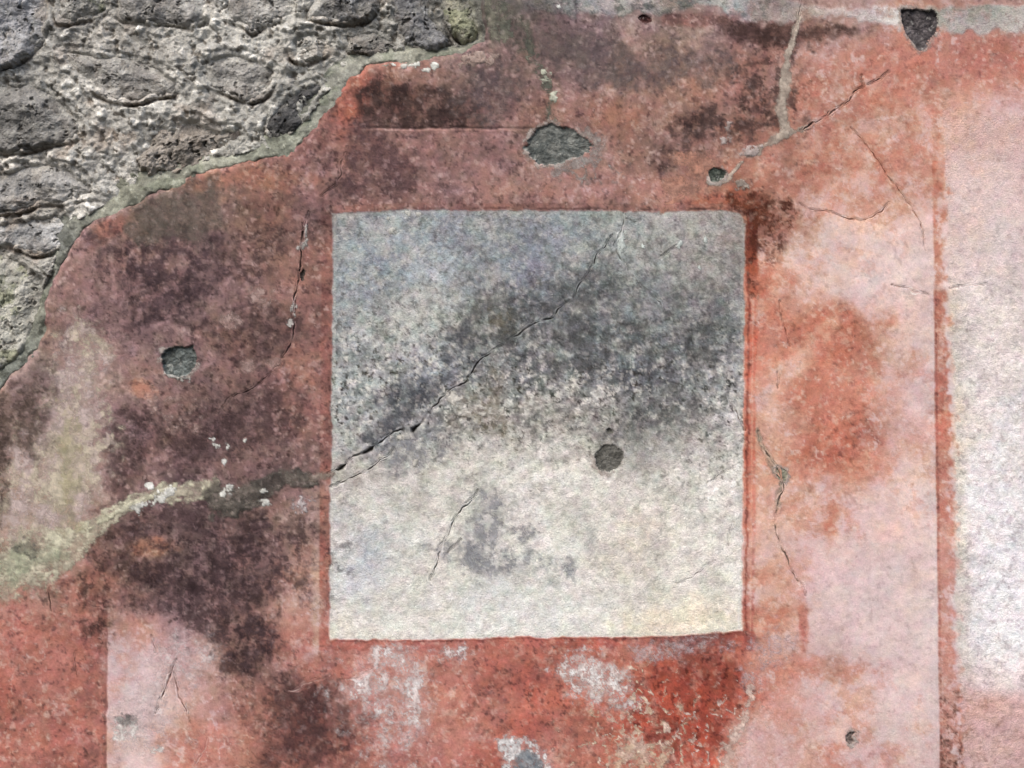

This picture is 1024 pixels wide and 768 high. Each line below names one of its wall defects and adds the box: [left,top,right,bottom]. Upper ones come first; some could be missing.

leakage [129,501,315,676]
spalling [0,0,486,390]
crack [218,152,346,422]
crack [0,212,668,611]
flaking render [522,120,611,182]
crack [727,397,807,596]
crack [707,0,926,250]